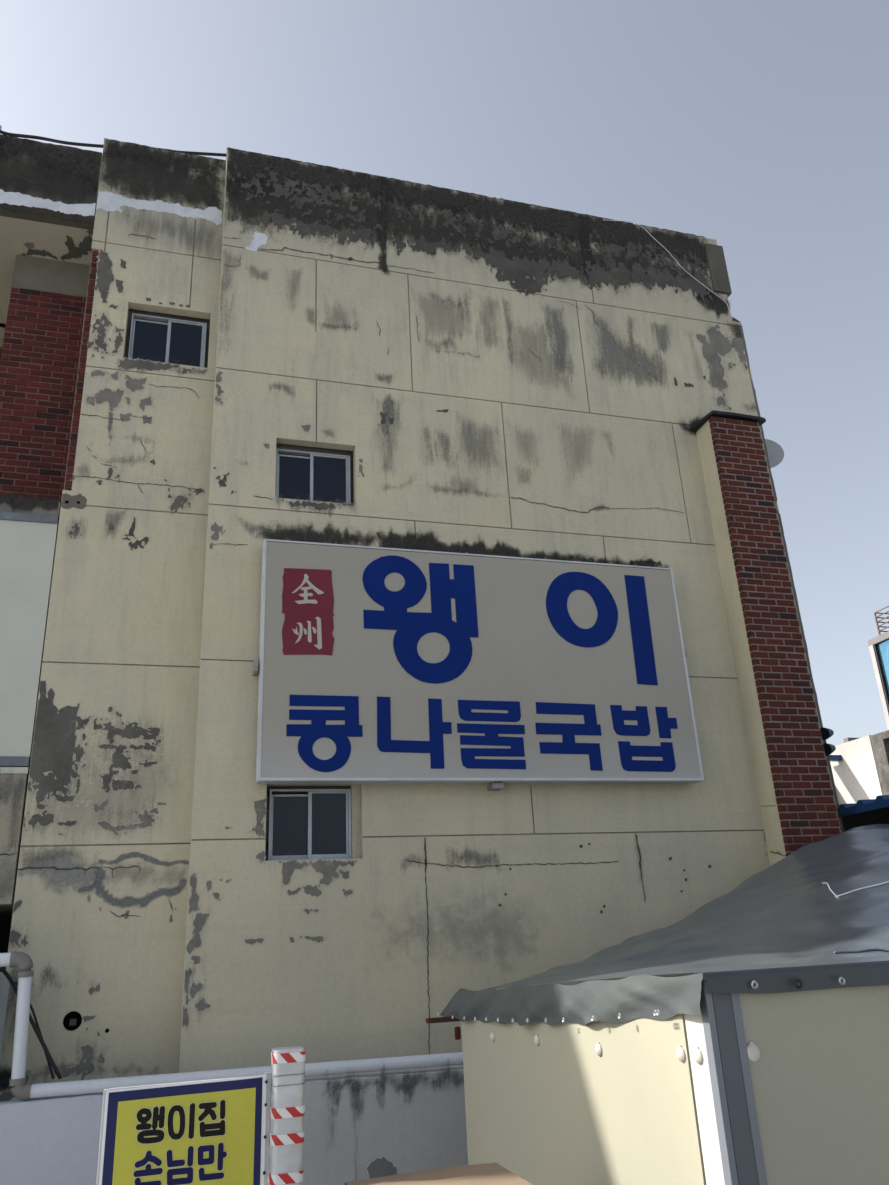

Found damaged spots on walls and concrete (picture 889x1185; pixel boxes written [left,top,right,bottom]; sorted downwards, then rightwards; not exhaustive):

leakage [0,137,742,339]
peeling [2,207,227,446]
leakage [547,308,569,369]
leakage [597,321,667,384]
peeling [164,479,205,515]
leakage [210,522,245,549]
peeling [214,467,242,495]
leakage [246,524,668,568]
crack [511,497,682,513]
peeling [21,680,167,843]
peeling [249,798,267,837]
peeling [256,851,357,914]